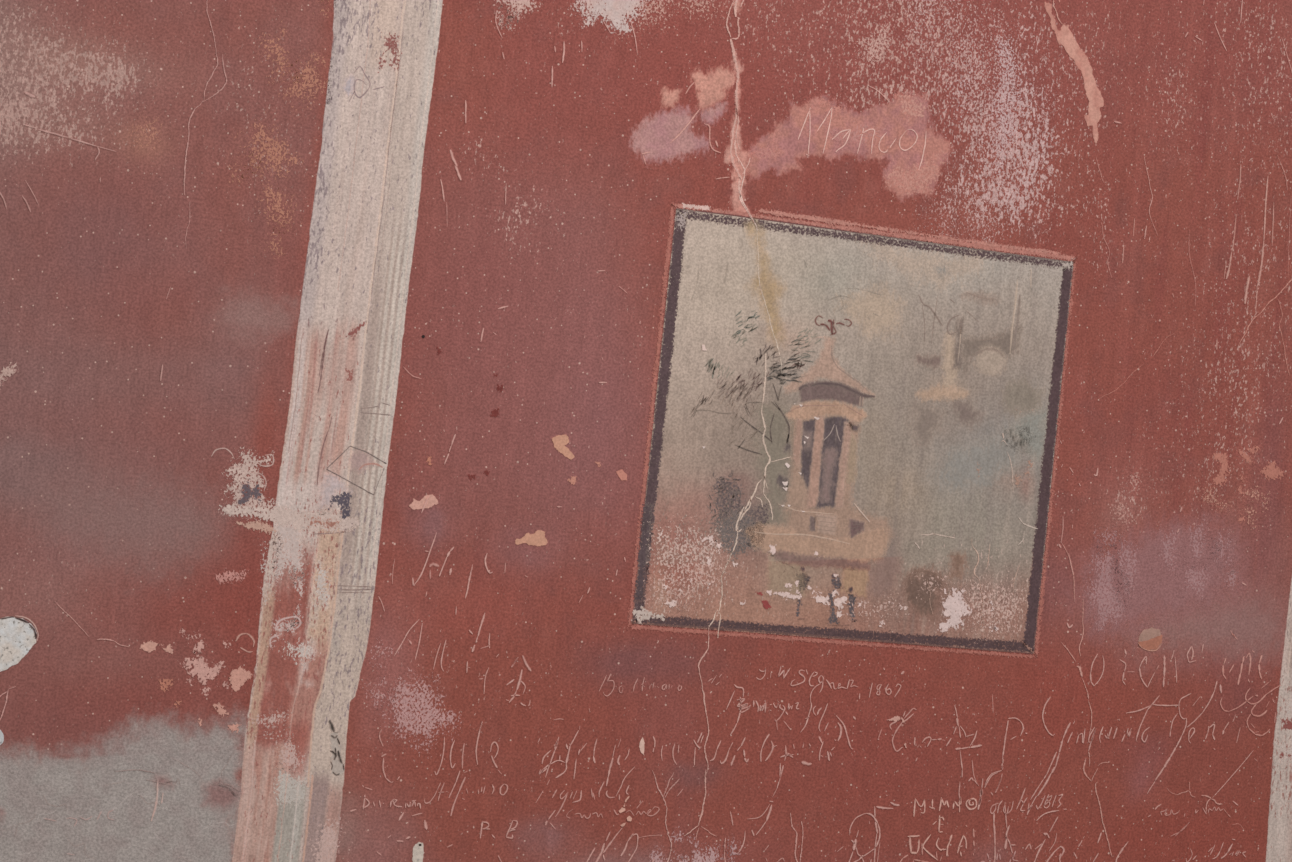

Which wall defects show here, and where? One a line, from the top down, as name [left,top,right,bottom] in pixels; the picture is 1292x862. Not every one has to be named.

peeling [491,0,540,34]
peeling [568,0,733,41]
peeling [630,87,727,163]
peeling [746,0,1060,251]
peeling [552,435,575,460]
crack [652,0,790,862]
peeling [409,494,438,510]
peeling [515,530,548,546]
peeling [642,515,738,616]
peeling [766,562,1027,641]
flaking render [0,616,39,672]
flaking render [1138,627,1162,651]